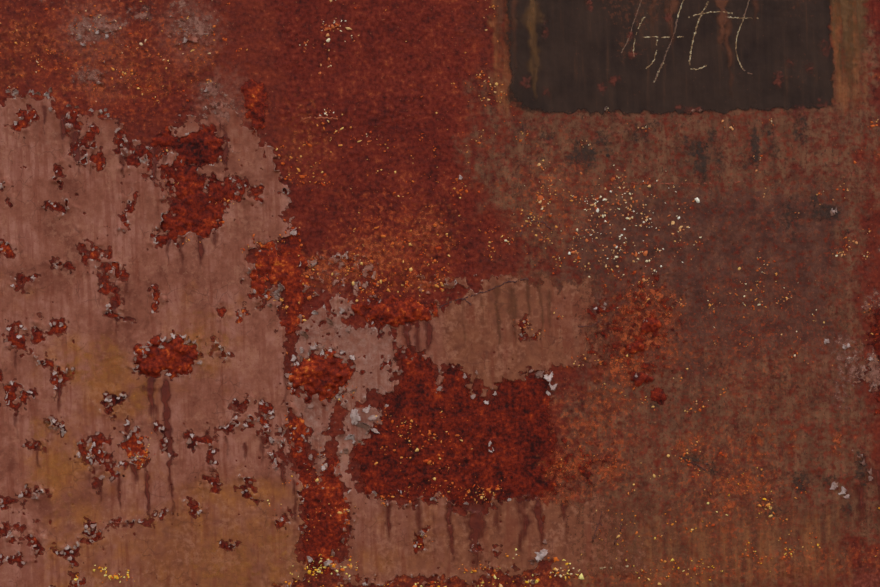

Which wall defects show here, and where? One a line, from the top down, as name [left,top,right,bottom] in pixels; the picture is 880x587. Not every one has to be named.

rust [299,18,359,75]
peeling [4,319,76,390]
peeling [133,330,203,379]
peeling [114,124,264,248]
peeling [247,223,364,409]
rust [273,130,496,351]
crack [438,278,529,308]
rust [479,160,703,559]
peeling [77,392,149,485]
peeling [219,346,557,579]
rust [375,407,514,587]
rust [525,557,584,587]